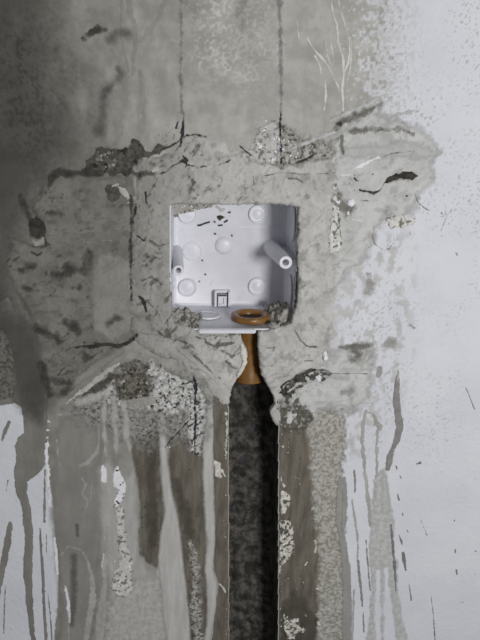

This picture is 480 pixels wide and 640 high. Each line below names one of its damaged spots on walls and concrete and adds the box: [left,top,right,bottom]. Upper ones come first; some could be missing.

damp [0,0,66,208]
spalling [48,139,155,185]
spalling [240,117,336,169]
crack [126,121,230,316]
damp [0,239,208,640]
spalling [65,357,211,456]
spalling [279,351,351,435]
damp [339,343,369,361]
damp [382,369,403,514]
damp [342,470,371,640]
damp [390,524,407,591]